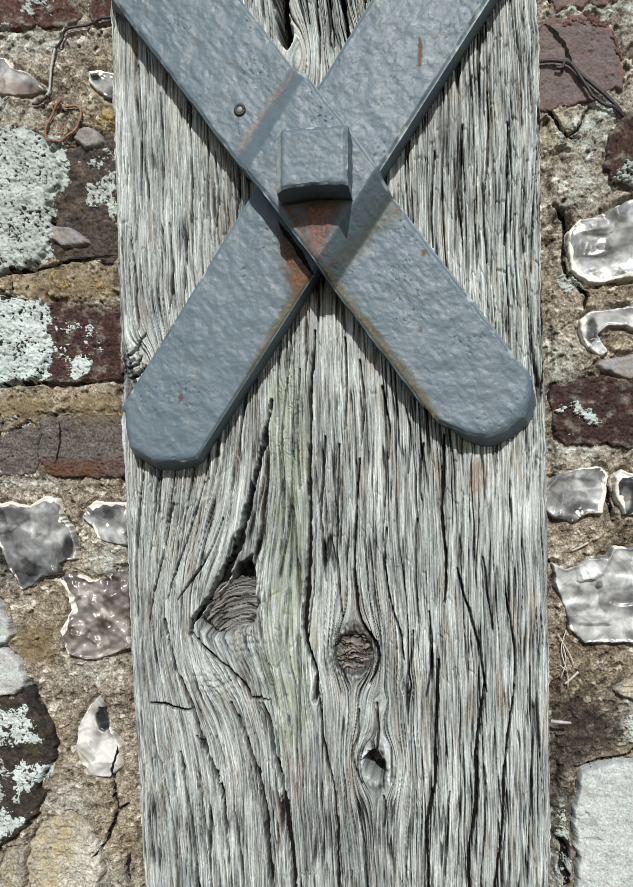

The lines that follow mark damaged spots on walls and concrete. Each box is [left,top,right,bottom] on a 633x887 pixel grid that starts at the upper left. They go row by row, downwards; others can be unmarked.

crack [282,0,293,47]
rust [281,233,309,294]
crack [91,746,130,858]
crack [124,854,132,879]